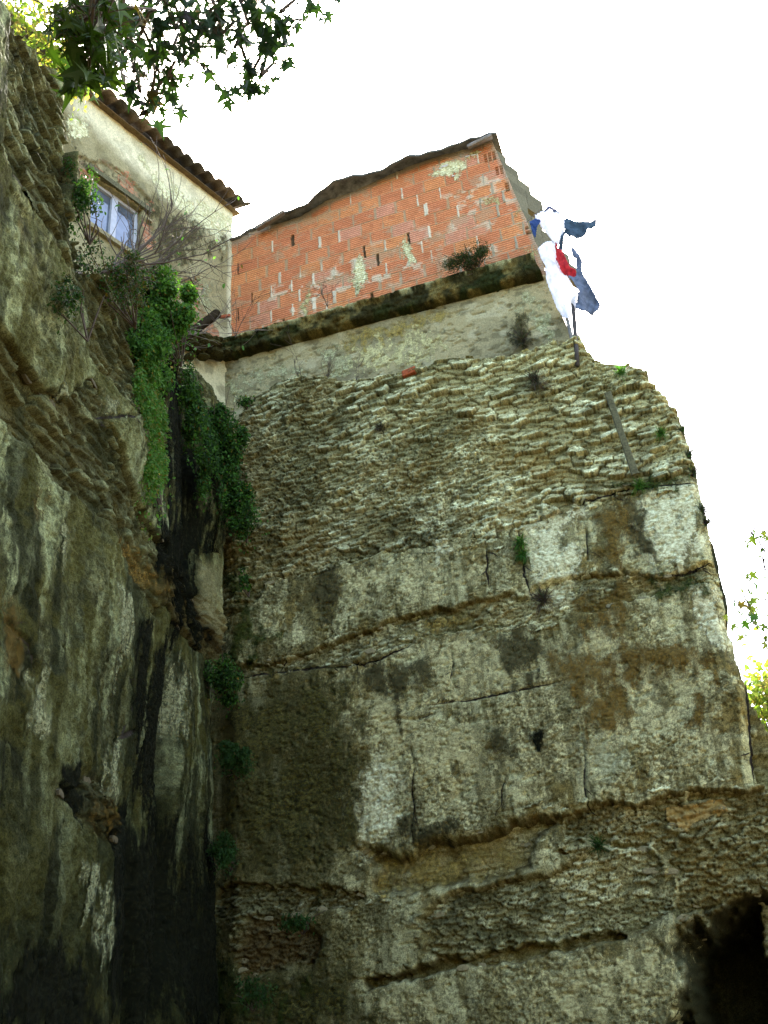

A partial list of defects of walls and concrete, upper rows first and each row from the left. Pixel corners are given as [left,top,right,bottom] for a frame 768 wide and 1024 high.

crack [481,533,539,602]
crack [661,563,711,579]
damp [0,344,440,1024]
crack [390,653,560,723]
damp [211,622,545,903]
crack [410,750,418,846]
crack [583,744,597,816]